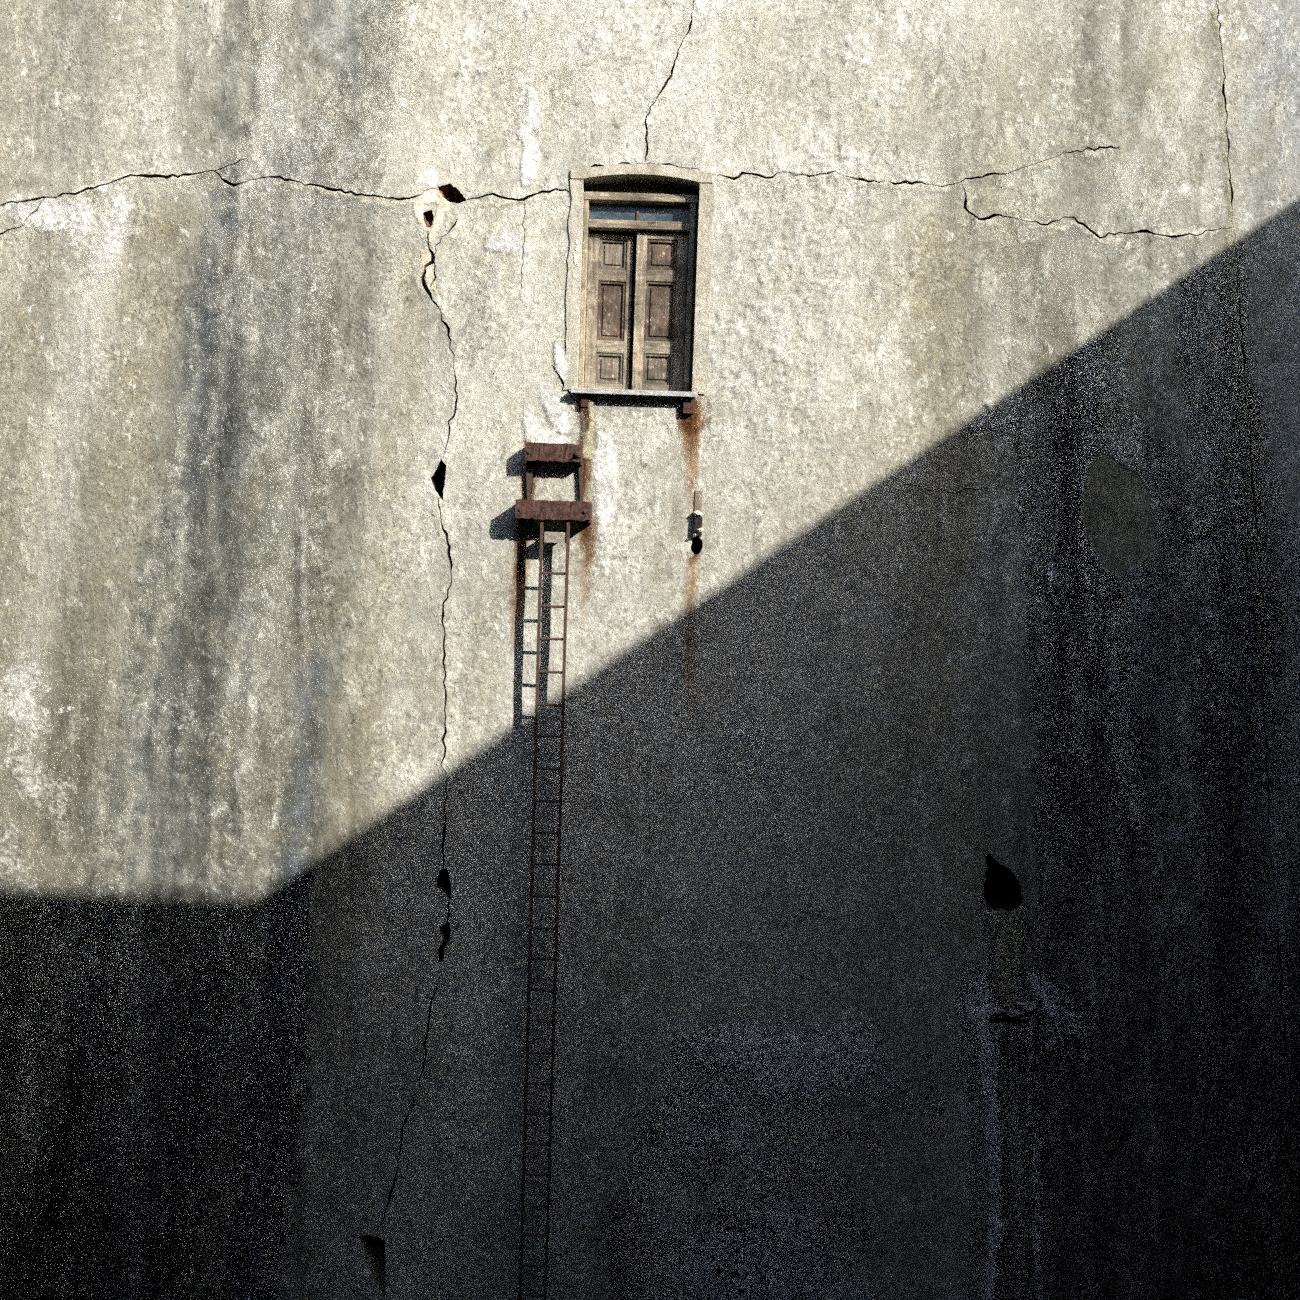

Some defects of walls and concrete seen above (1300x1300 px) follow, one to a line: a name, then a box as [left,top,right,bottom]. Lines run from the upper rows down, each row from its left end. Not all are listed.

spalling [413,170,466,290]
crack [0,158,571,457]
spalling [431,460,446,500]
rust [577,397,596,497]
rust [686,399,697,435]
rust [517,518,531,585]
damp [0,663,48,736]
crack [433,496,453,948]
crack [590,0,1296,1300]
damp [12,754,67,818]
spalling [983,852,1023,911]
damp [968,978,1004,1300]